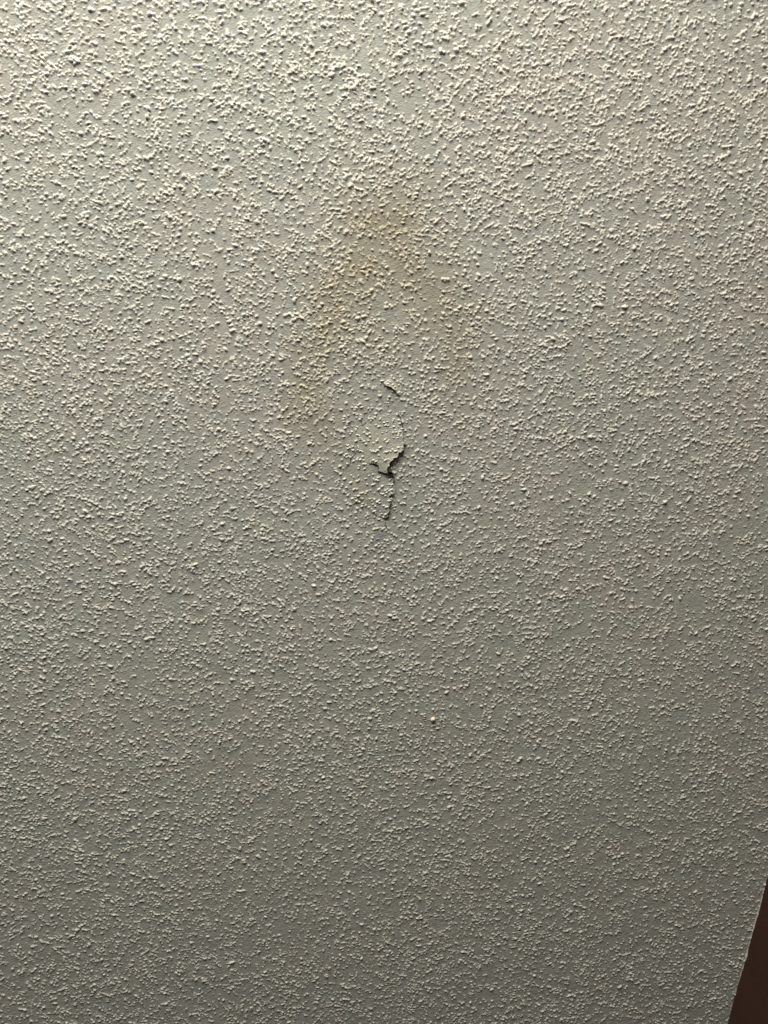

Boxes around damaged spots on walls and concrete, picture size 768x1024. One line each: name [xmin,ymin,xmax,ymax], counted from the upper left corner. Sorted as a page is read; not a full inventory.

peeling [384,376,401,397]